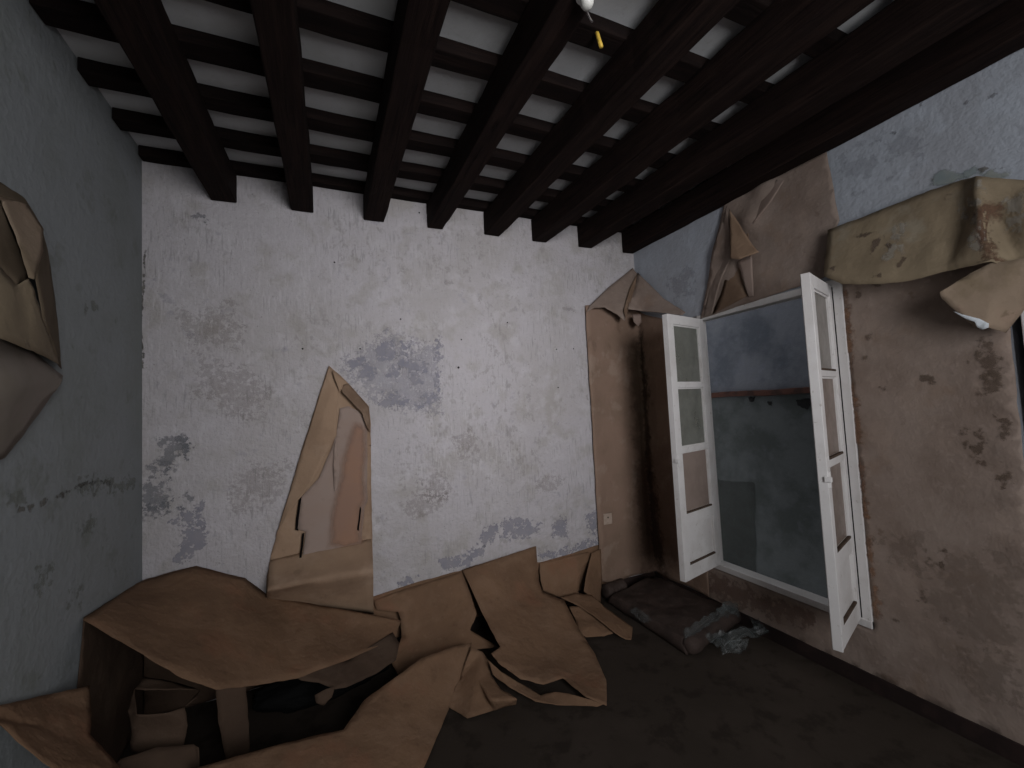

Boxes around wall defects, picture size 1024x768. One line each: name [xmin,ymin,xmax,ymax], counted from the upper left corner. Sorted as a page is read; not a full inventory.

leakage [967,339,1003,395]